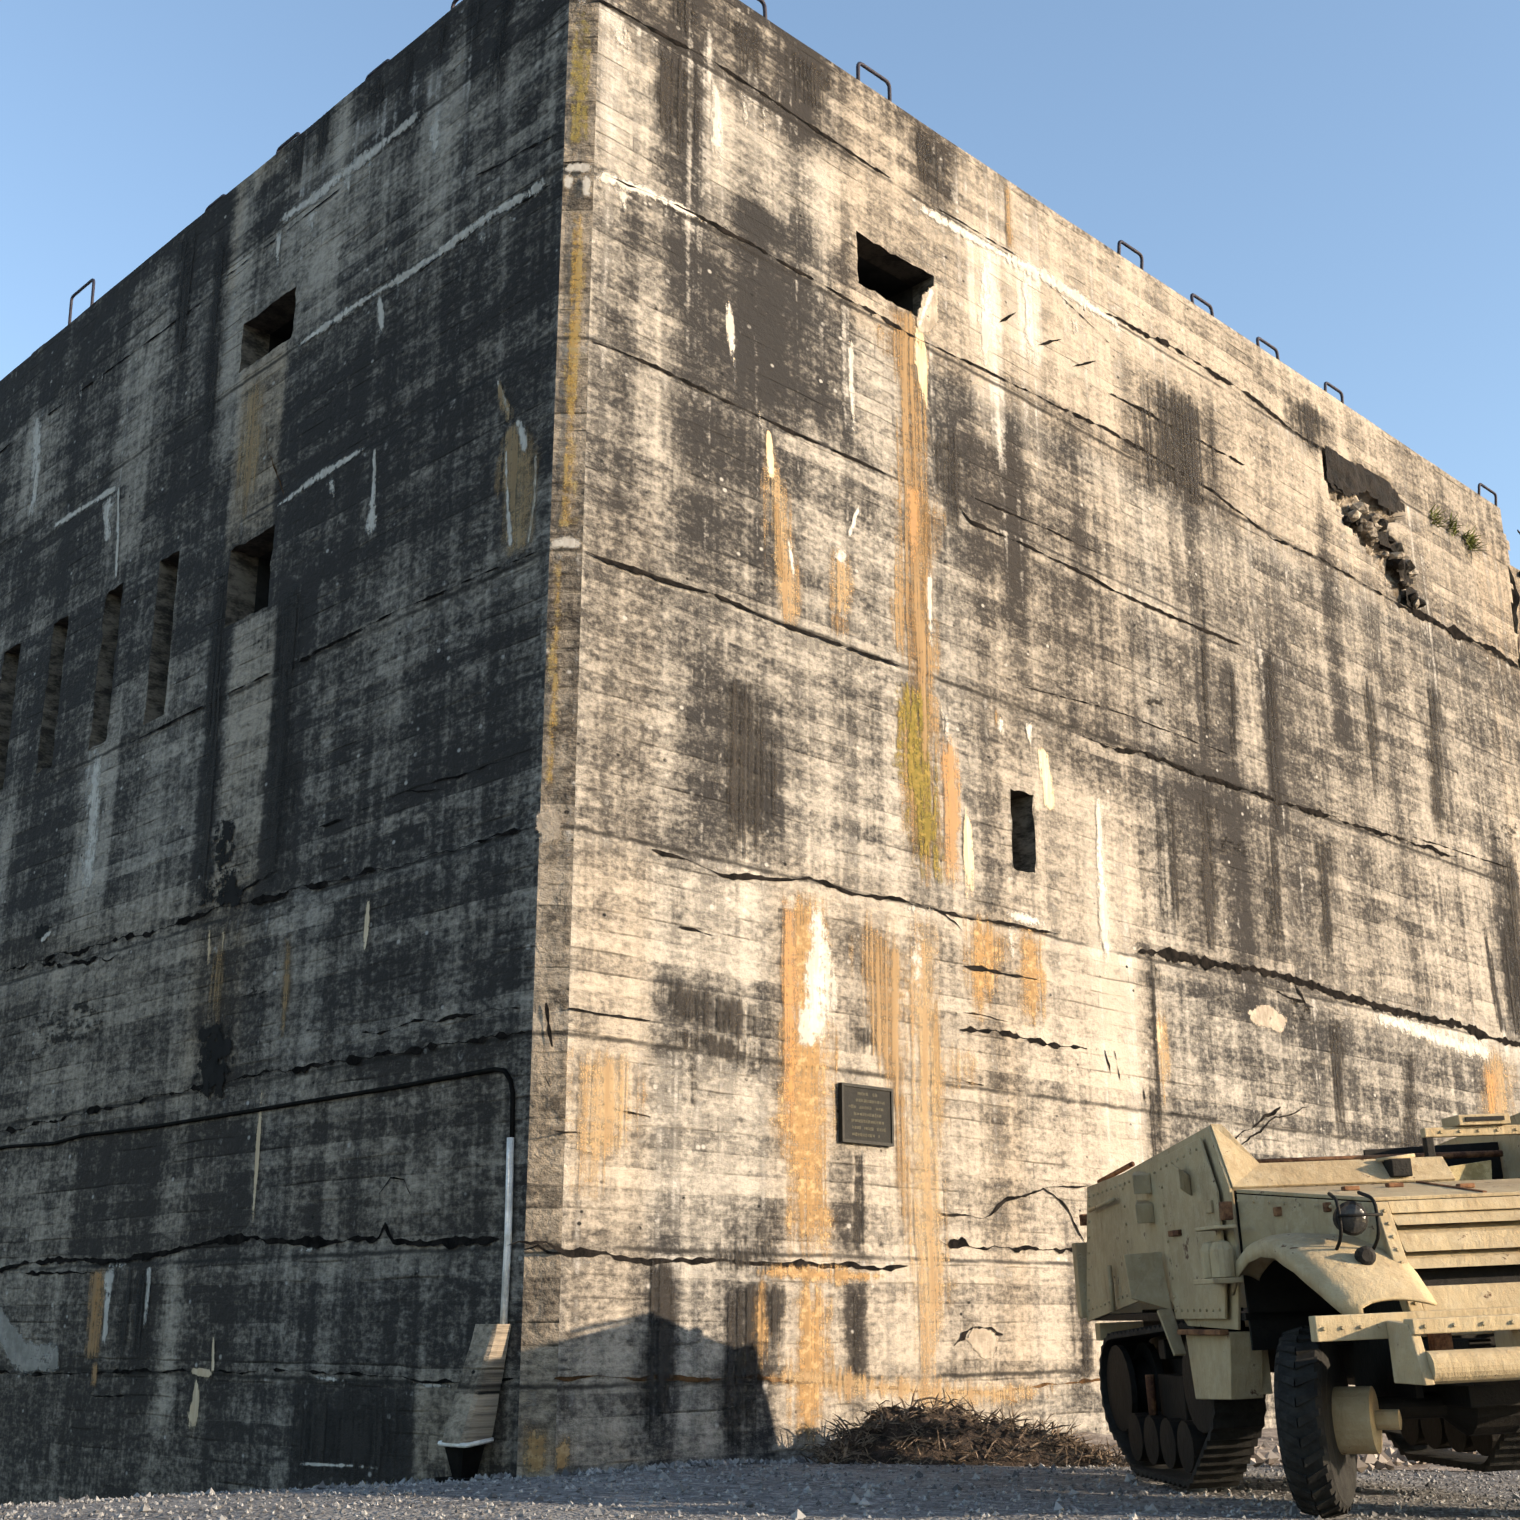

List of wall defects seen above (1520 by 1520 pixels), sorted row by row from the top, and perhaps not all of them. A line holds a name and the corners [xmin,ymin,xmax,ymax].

damp [276,109,440,260]
damp [301,178,544,344]
rust [496,381,538,552]
rust [763,431,800,624]
rust [877,311,974,897]
spalling [1322,445,1427,609]
damp [194,1020,234,1103]
crack [0,1177,908,1276]
rust [752,895,1053,1448]
crack [939,1185,1088,1254]
crack [1235,1107,1306,1145]
crack [1138,947,1520,1060]